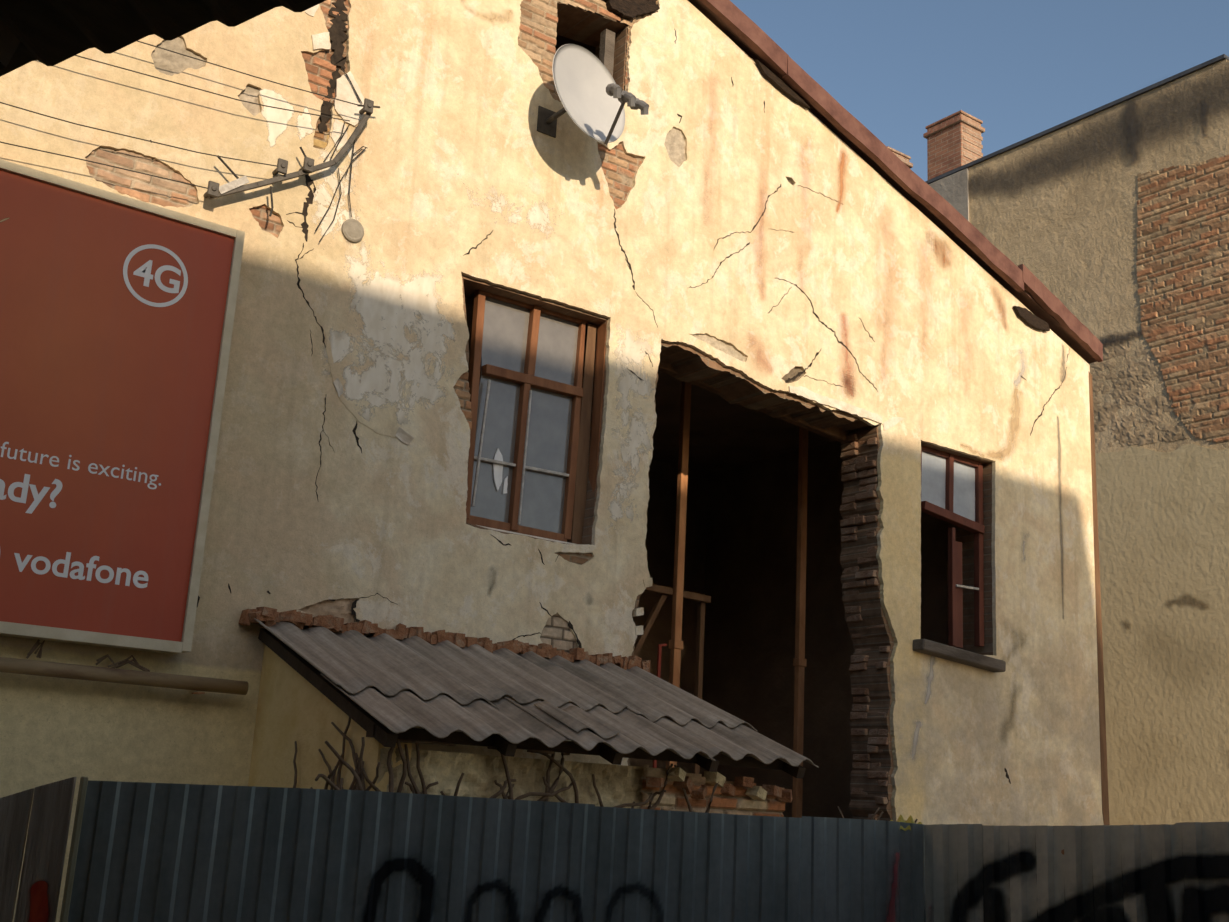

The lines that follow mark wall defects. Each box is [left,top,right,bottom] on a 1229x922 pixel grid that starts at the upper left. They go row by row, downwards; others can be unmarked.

flaking render [151,37,206,76]
flaking render [518,0,658,102]
flaking render [85,140,197,208]
flaking render [598,142,643,209]
crack [286,174,326,356]
crack [613,209,658,381]
crack [689,184,842,288]
crack [769,278,877,390]
flaking render [1136,154,1229,443]
crack [315,397,362,499]
flaking render [540,613,578,653]